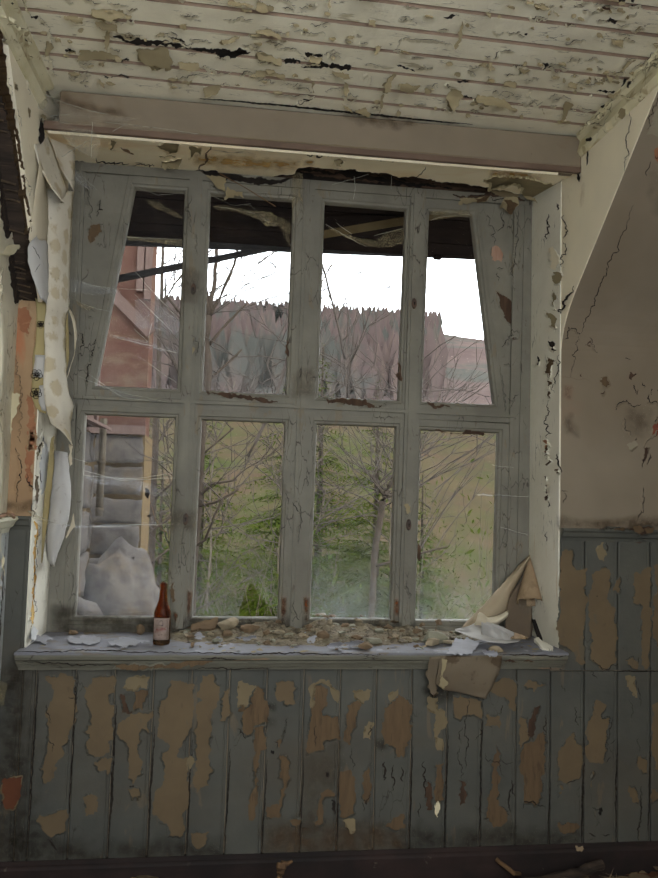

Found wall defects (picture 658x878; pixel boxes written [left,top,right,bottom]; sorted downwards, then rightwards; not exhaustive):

peeling [11,0,658,142]
spalling [0,15,34,334]
peeling [156,143,202,170]
spalling [199,159,478,201]
crack [453,192,525,291]
peeling [497,291,512,327]
crack [544,203,634,507]
peeling [36,661,414,852]
crack [382,761,426,817]
peeling [427,695,485,751]
crack [457,700,543,812]
peeling [556,700,611,783]